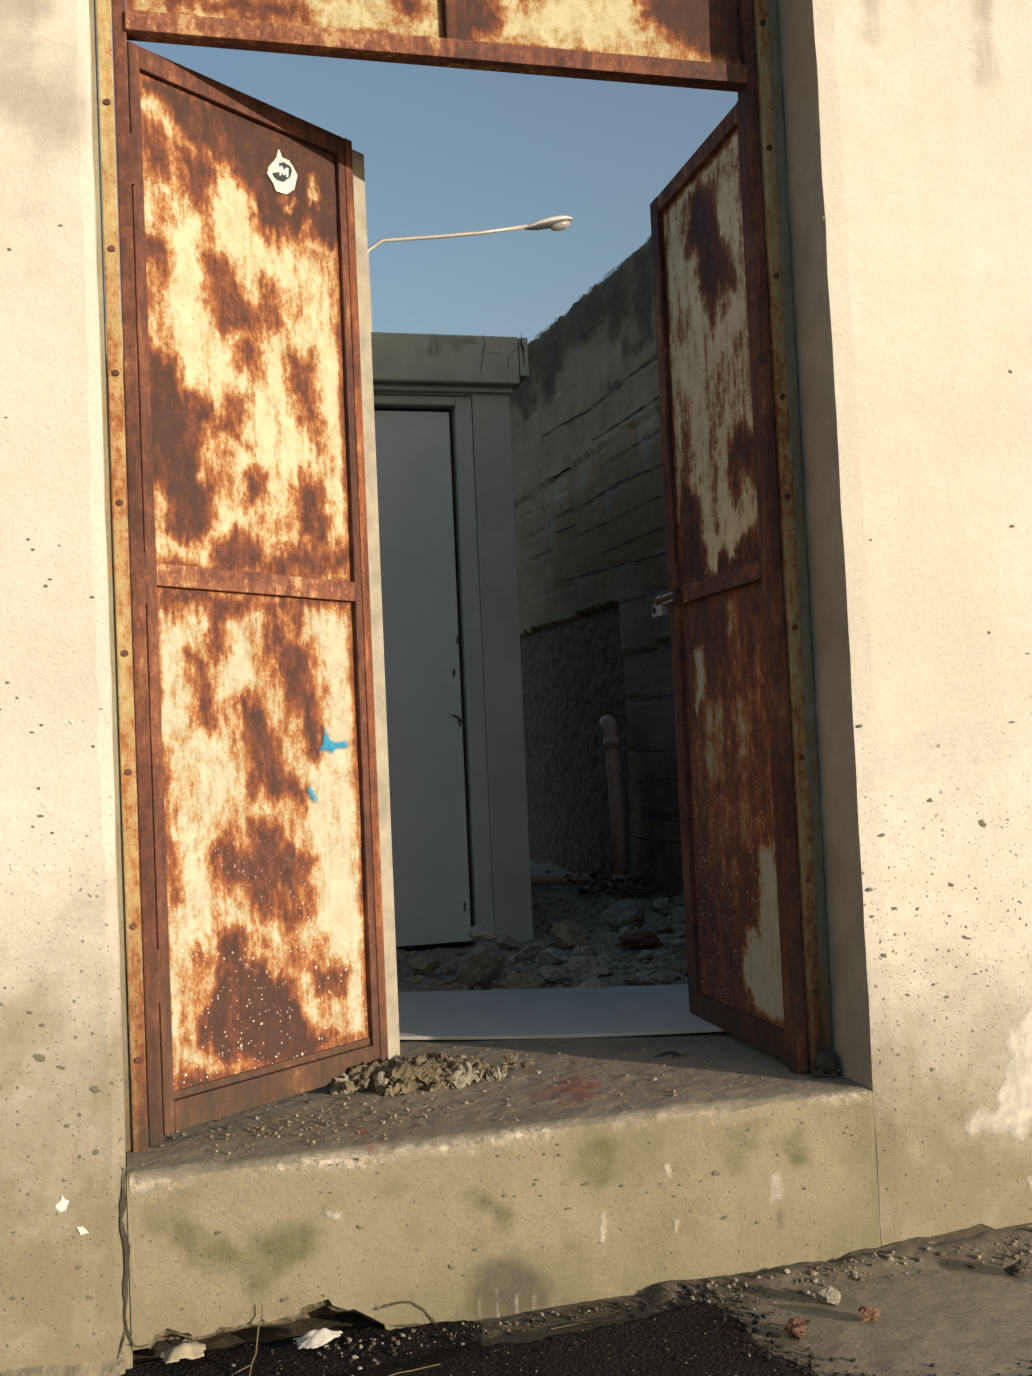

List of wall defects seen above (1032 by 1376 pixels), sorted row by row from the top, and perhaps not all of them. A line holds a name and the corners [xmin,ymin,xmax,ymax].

spalling [32,1054,65,1070]
leakage [996,1012,1032,1132]
spalling [0,1286,437,1376]